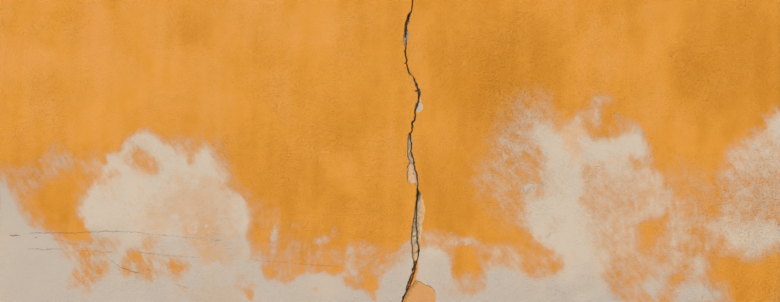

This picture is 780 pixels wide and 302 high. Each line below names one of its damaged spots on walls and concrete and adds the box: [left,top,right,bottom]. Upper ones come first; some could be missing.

peeling [0,78,780,302]
crack [401,0,422,302]